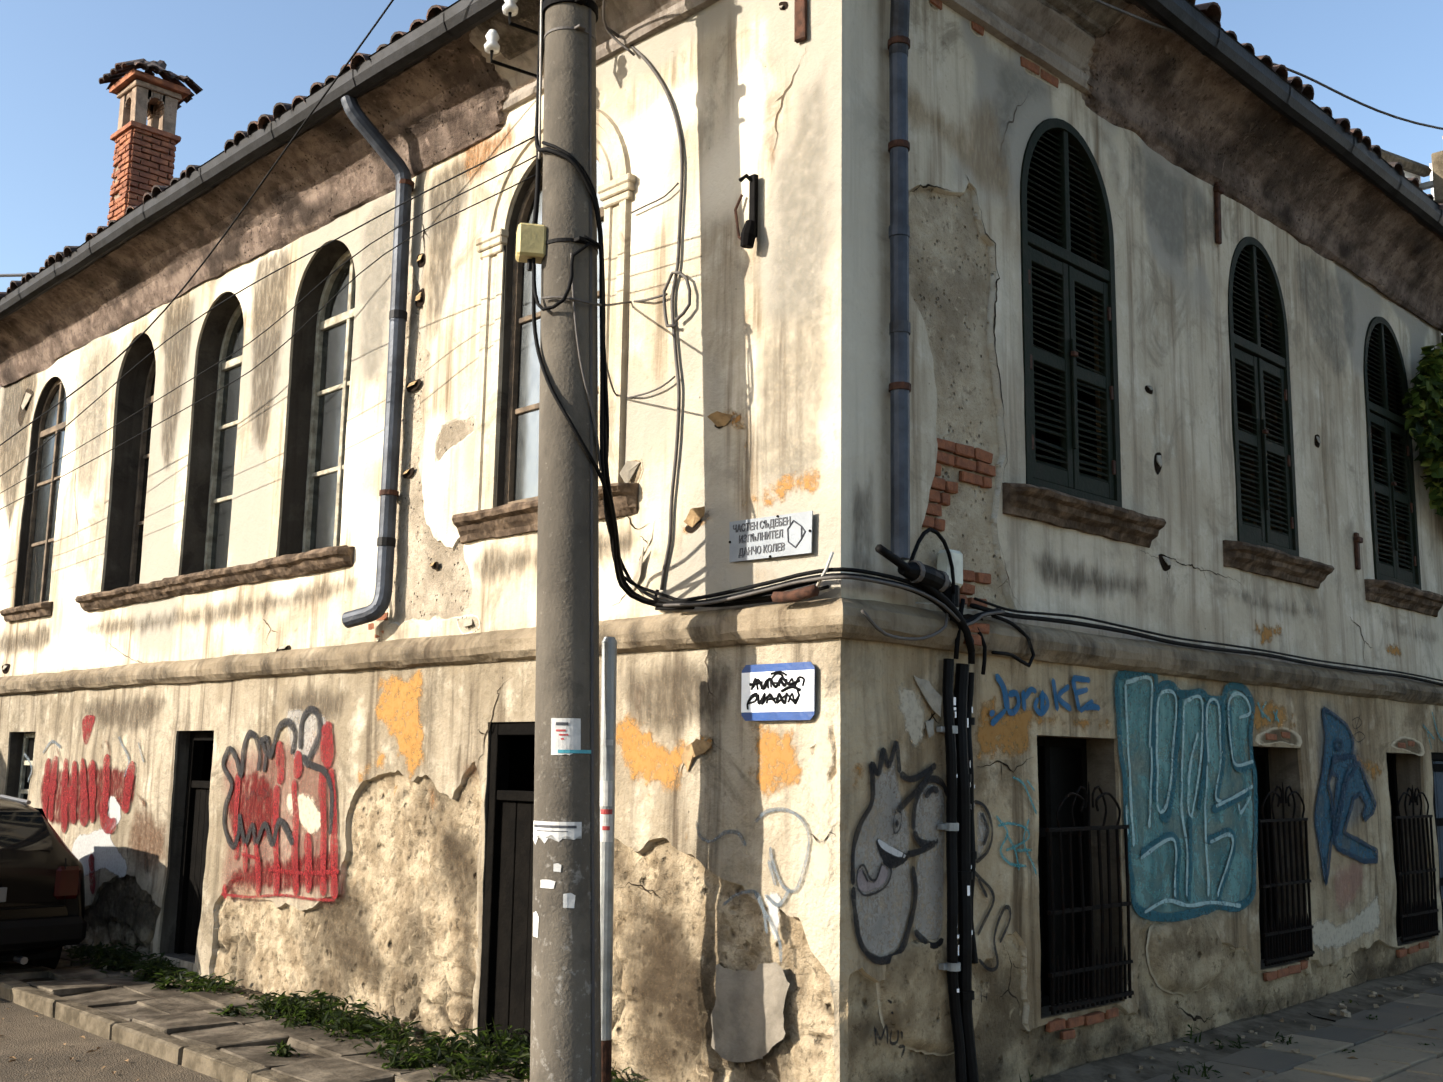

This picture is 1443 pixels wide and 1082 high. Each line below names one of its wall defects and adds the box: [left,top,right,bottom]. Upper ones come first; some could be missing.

crack [771,48,806,173]
water stain [430,165,467,316]
water stain [162,301,191,463]
water stain [252,253,287,442]
flaking render [368,253,480,638]
flaking render [909,182,1017,646]
water stain [1042,561,1119,590]
peeling [681,739,712,772]
flaking render [81,875,161,963]
flaking render [209,761,483,1047]
flaking render [611,837,956,1082]
flaking render [972,897,1441,1082]